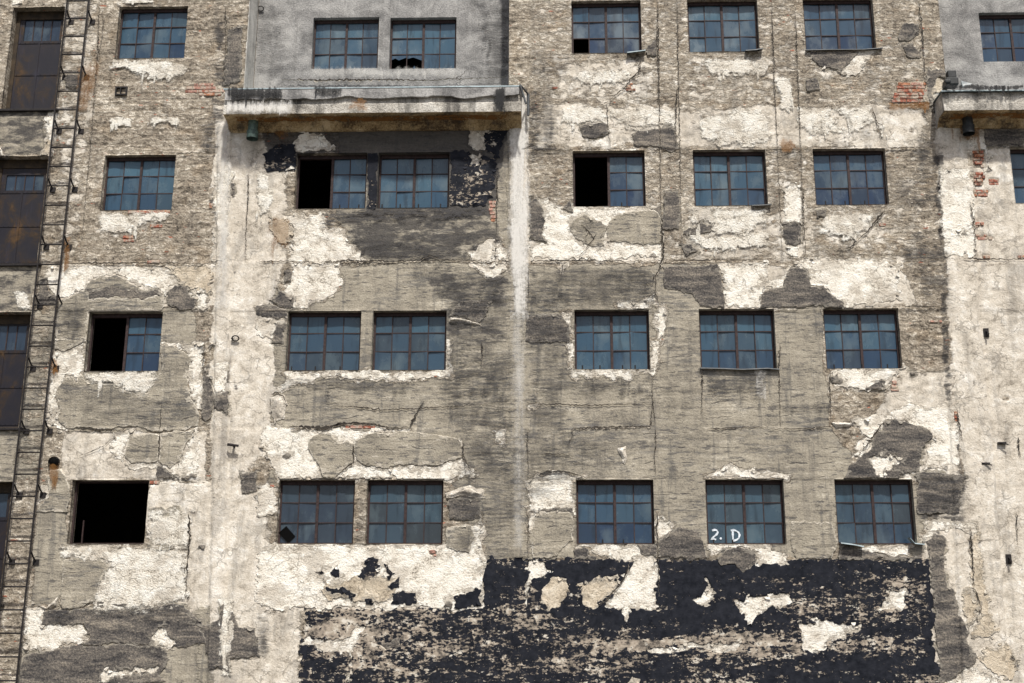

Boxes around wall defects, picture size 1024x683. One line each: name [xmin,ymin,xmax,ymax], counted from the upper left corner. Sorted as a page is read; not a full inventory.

peeling [13,169,236,317]
peeling [255,132,366,308]
damp [435,86,560,315]
crack [245,0,810,305]
peeling [527,199,671,272]
peeling [678,182,903,308]
peeling [241,423,475,518]
crack [271,391,507,478]
crack [526,375,657,479]
peeling [59,505,202,614]
crack [184,514,192,597]
peeling [254,470,1021,683]